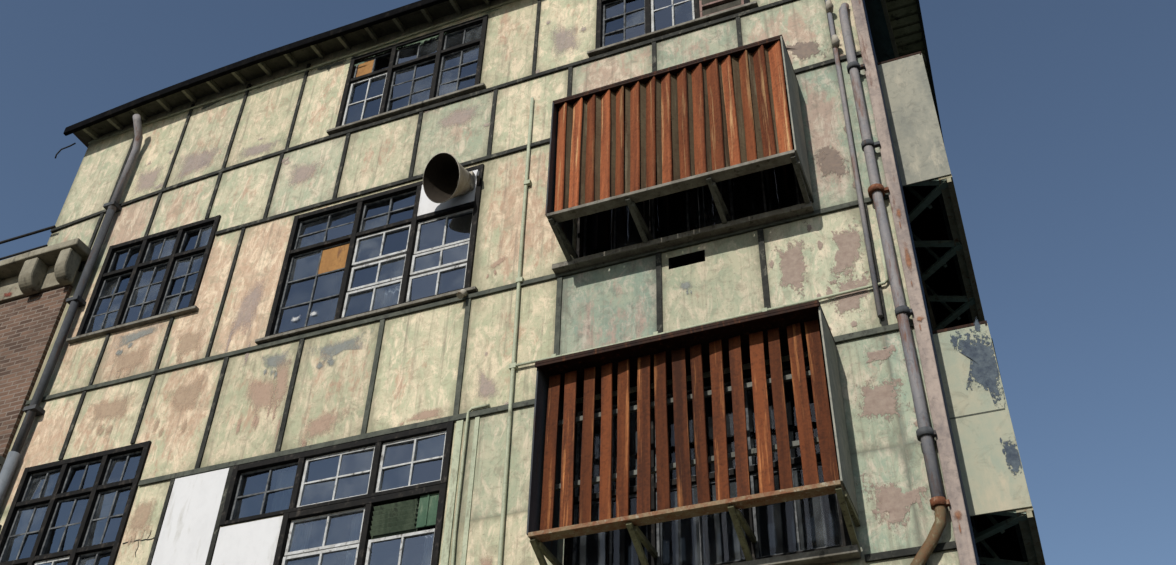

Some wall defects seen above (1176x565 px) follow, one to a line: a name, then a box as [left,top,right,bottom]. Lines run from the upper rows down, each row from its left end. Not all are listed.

peeling [769,222,873,327]
peeling [950,319,1005,408]
peeling [1000,437,1022,475]